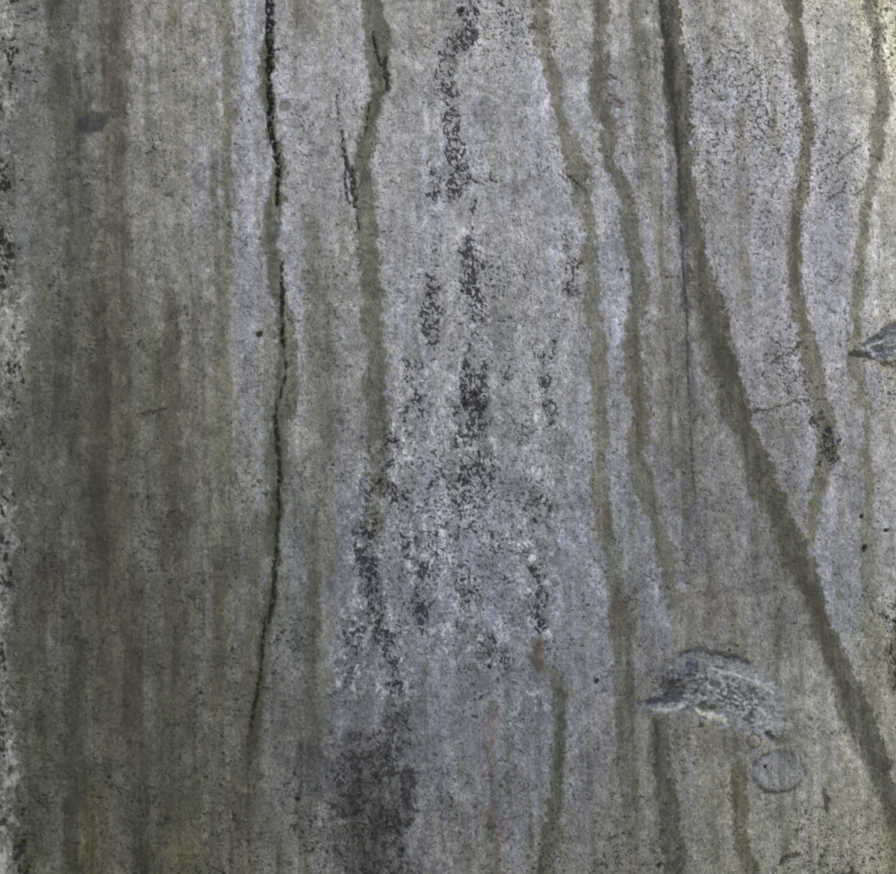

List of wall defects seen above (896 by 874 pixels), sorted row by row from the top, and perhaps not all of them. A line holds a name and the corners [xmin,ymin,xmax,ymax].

crack [264,0,283,207]
crack [335,30,392,231]
leakage [467,92,500,126]
leakage [0,0,342,874]
leakage [495,0,896,874]
spalling [847,320,896,378]
crack [245,260,289,874]
spalling [625,642,793,748]